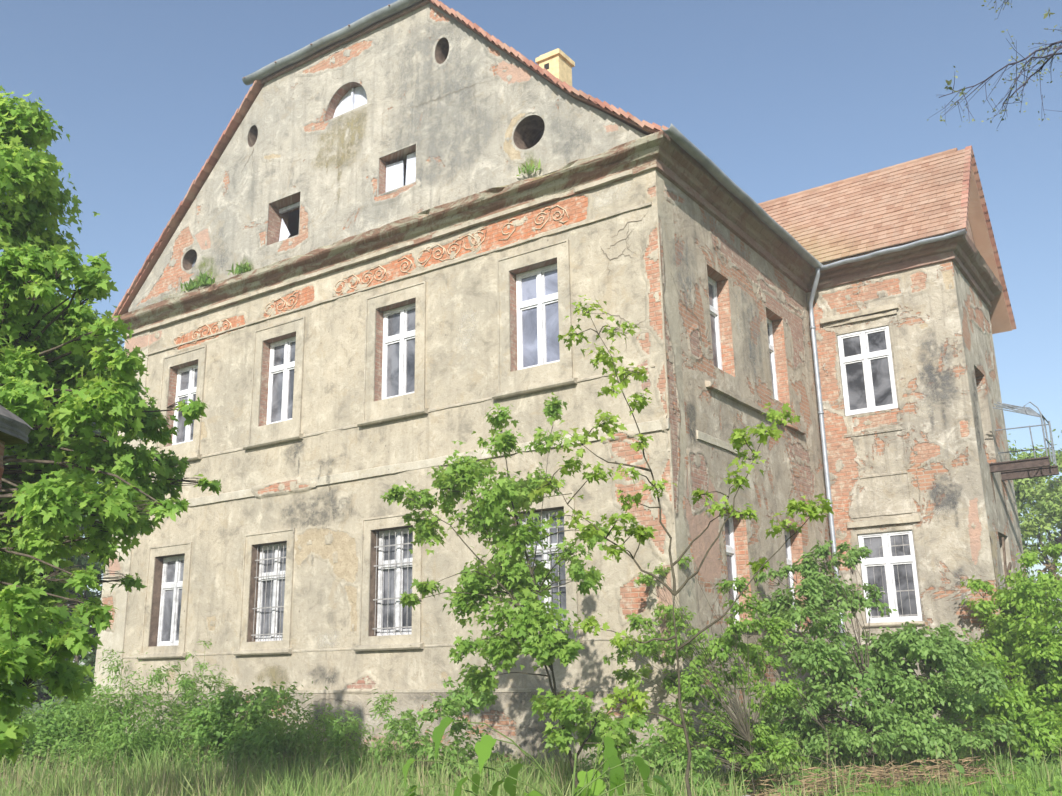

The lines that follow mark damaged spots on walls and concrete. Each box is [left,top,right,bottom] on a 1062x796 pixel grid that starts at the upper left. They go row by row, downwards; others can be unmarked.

spalling [643,182,687,209]
spalling [131,221,214,311]
spalling [708,224,955,575]
spalling [251,475,317,500]
spalling [603,216,723,675]
spalling [341,669,382,695]